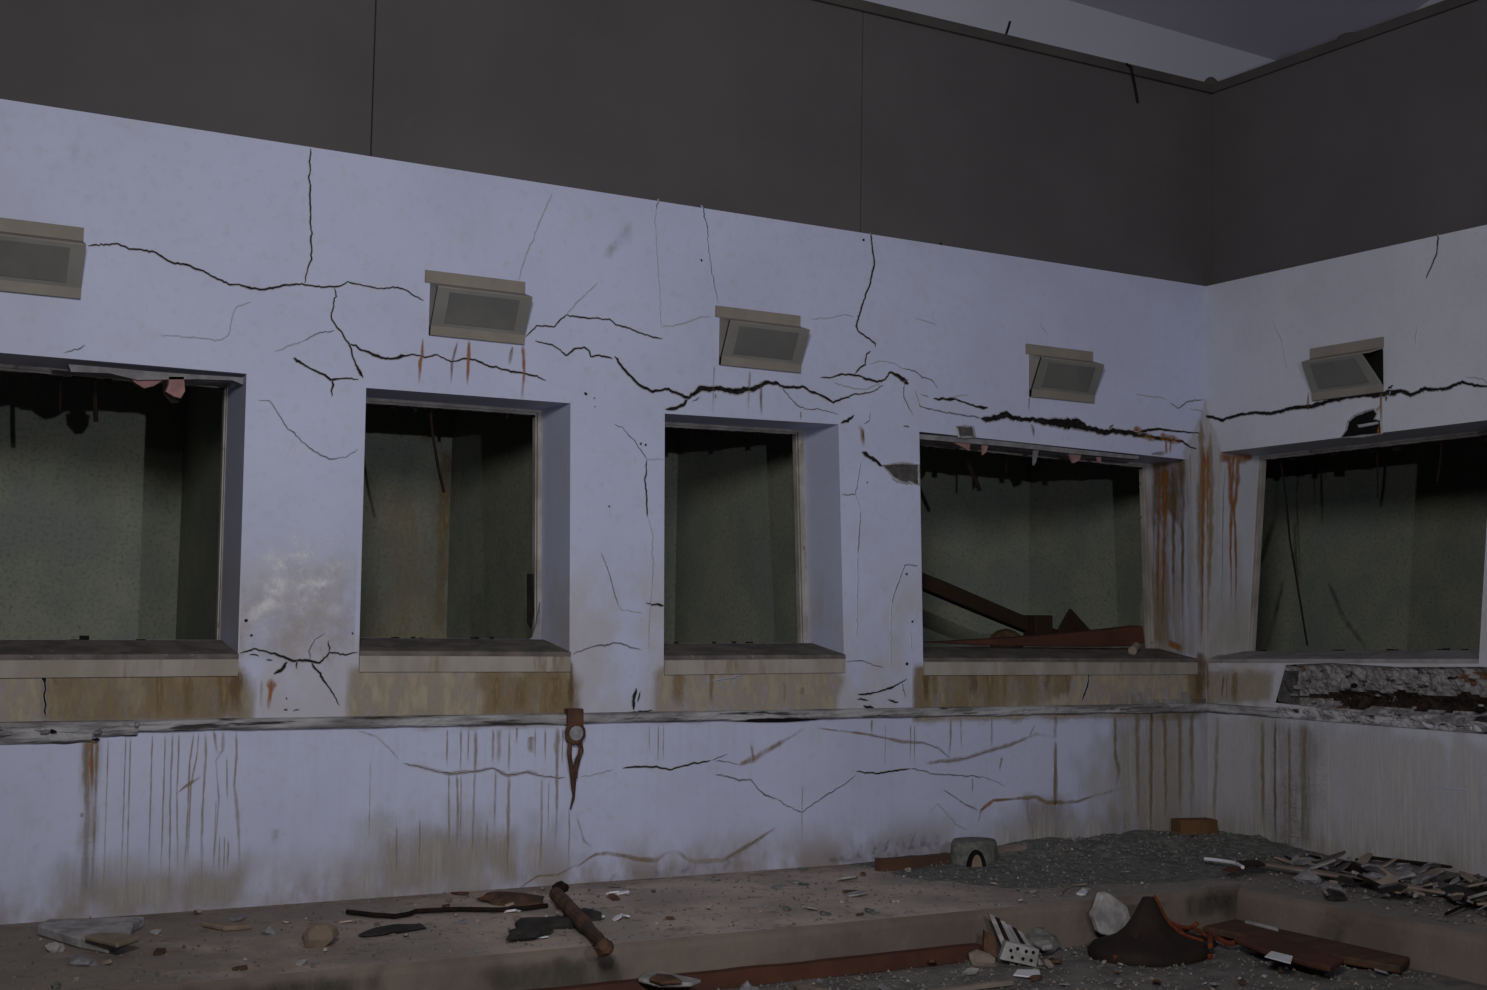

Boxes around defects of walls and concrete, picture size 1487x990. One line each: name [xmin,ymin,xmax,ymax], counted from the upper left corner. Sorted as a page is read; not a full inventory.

crack [88,148,1487,830]
corrosion [1134,403,1270,703]
damp [0,669,253,738]
damp [349,667,577,764]
damp [656,670,841,746]
spalling [1276,663,1487,734]
damp [150,742,205,831]
damp [516,732,563,803]
damp [910,668,1487,872]